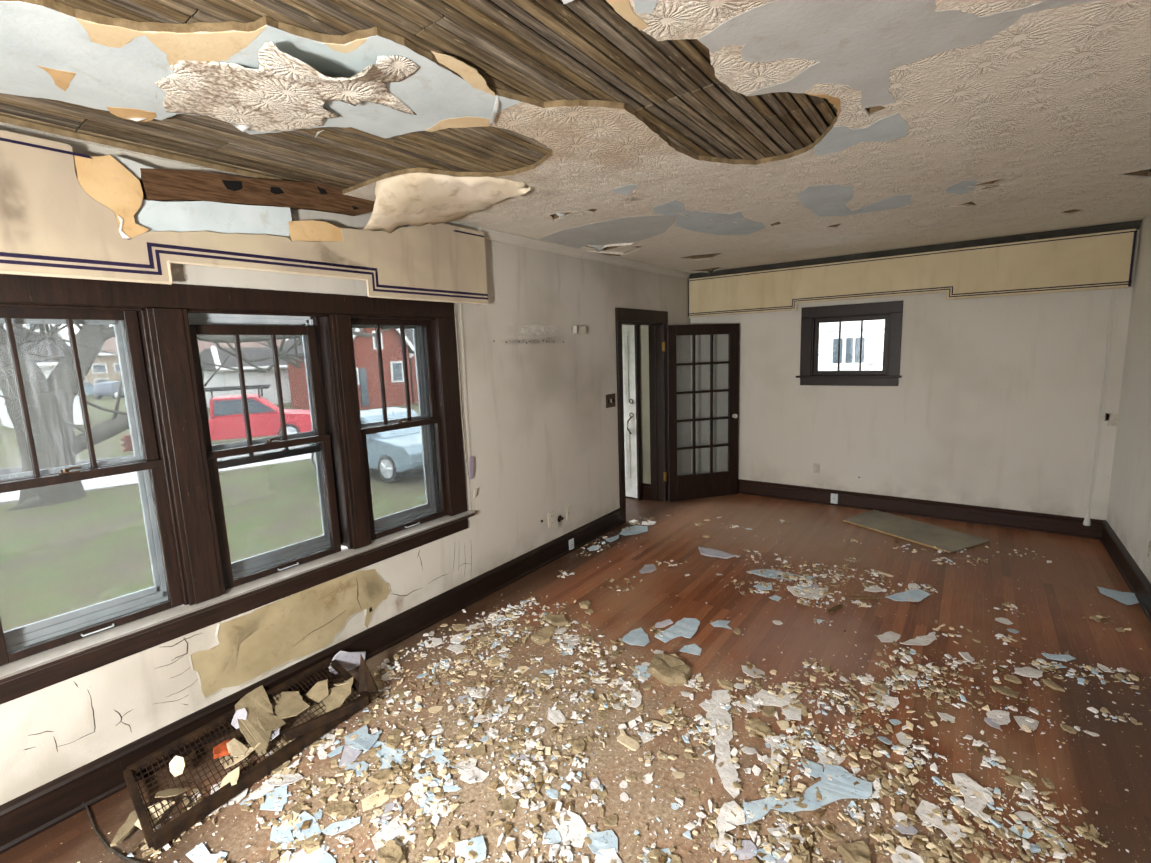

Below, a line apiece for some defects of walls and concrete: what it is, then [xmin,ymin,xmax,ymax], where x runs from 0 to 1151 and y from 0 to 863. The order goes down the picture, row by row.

peeling [0,1,520,138]
peeling [606,0,658,30]
peeling [698,0,1101,156]
peeling [74,155,343,242]
peeling [797,185,911,217]
crack [24,633,201,752]
spalling [189,569,392,703]